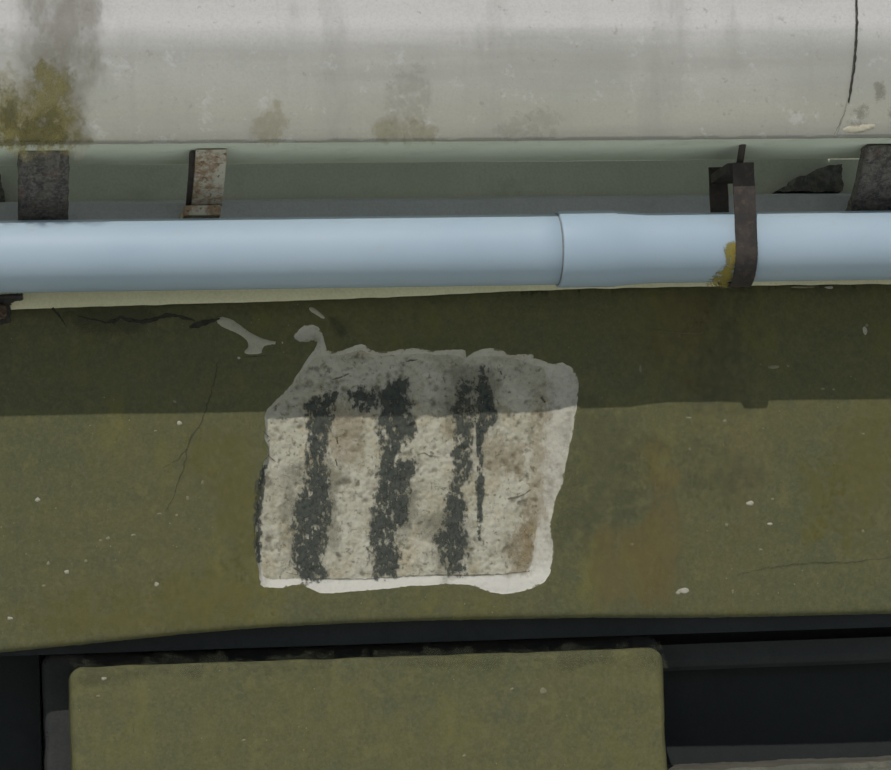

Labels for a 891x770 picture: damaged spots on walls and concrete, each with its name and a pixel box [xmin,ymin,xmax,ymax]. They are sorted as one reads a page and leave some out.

crack [848,0,859,103]
peeling [217,317,283,359]
spalling [253,307,579,594]